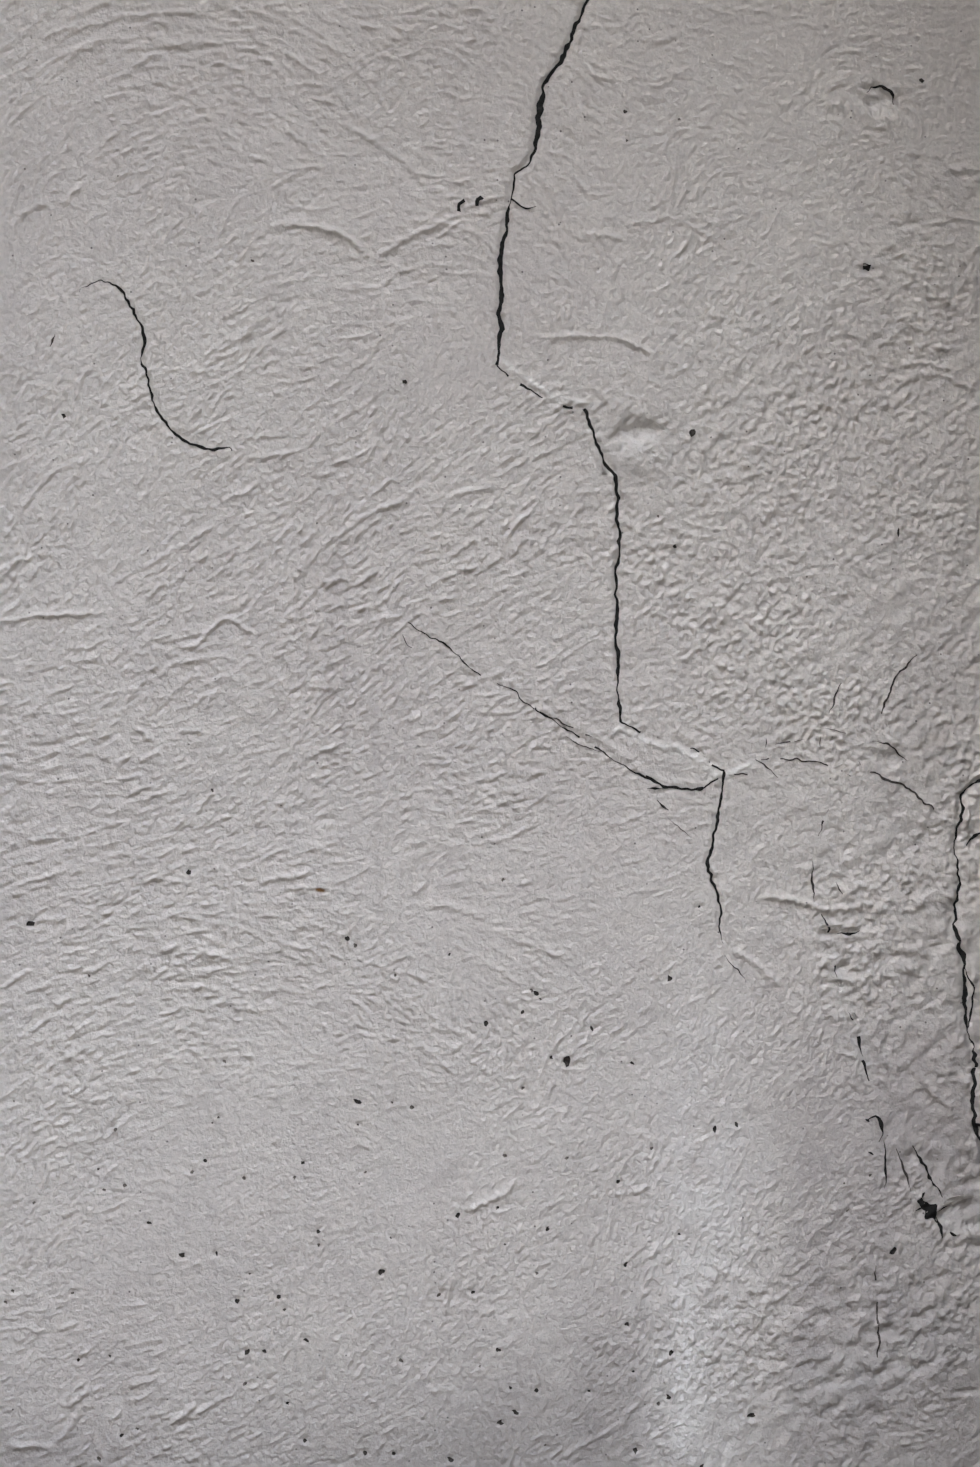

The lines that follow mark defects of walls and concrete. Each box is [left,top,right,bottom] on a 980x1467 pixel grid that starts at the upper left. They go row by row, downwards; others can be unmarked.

crack [79,280,232,452]
crack [403,0,980,1141]
crack [865,1115,942,1196]